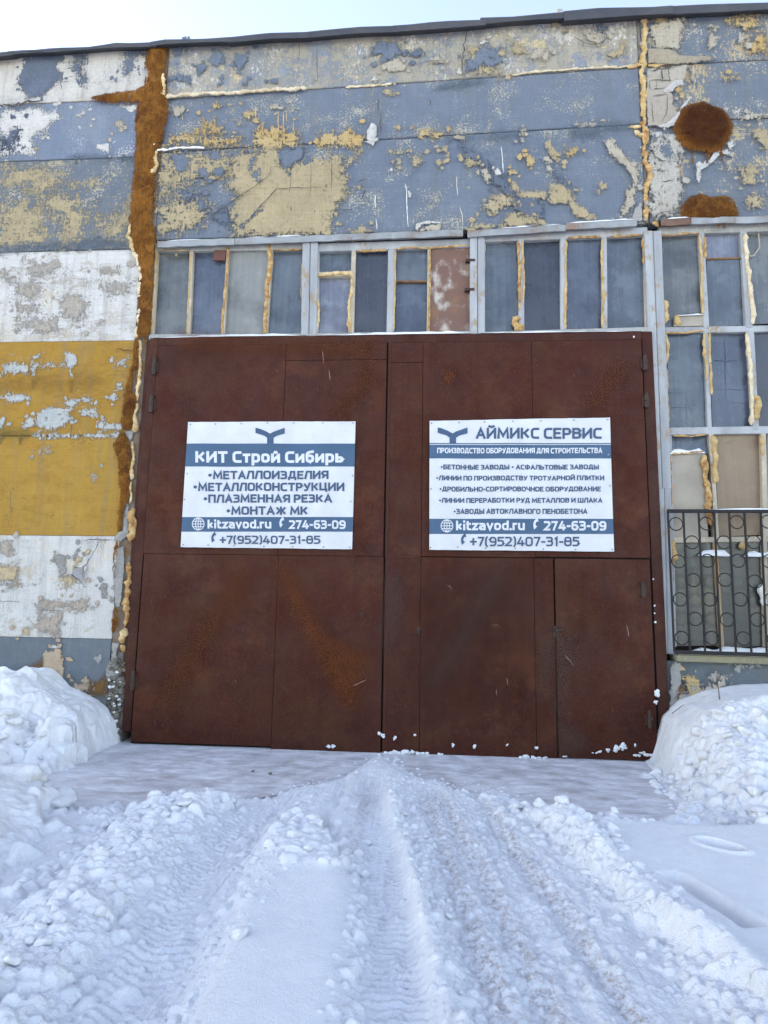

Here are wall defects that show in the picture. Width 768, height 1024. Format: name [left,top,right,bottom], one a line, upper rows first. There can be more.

peeling [0,53,137,339]
peeling [109,51,147,83]
peeling [151,100,599,245]
peeling [363,36,557,97]
spalling [583,13,768,221]
peeling [0,349,133,460]
spalling [0,503,129,696]
spalling [669,662,762,708]